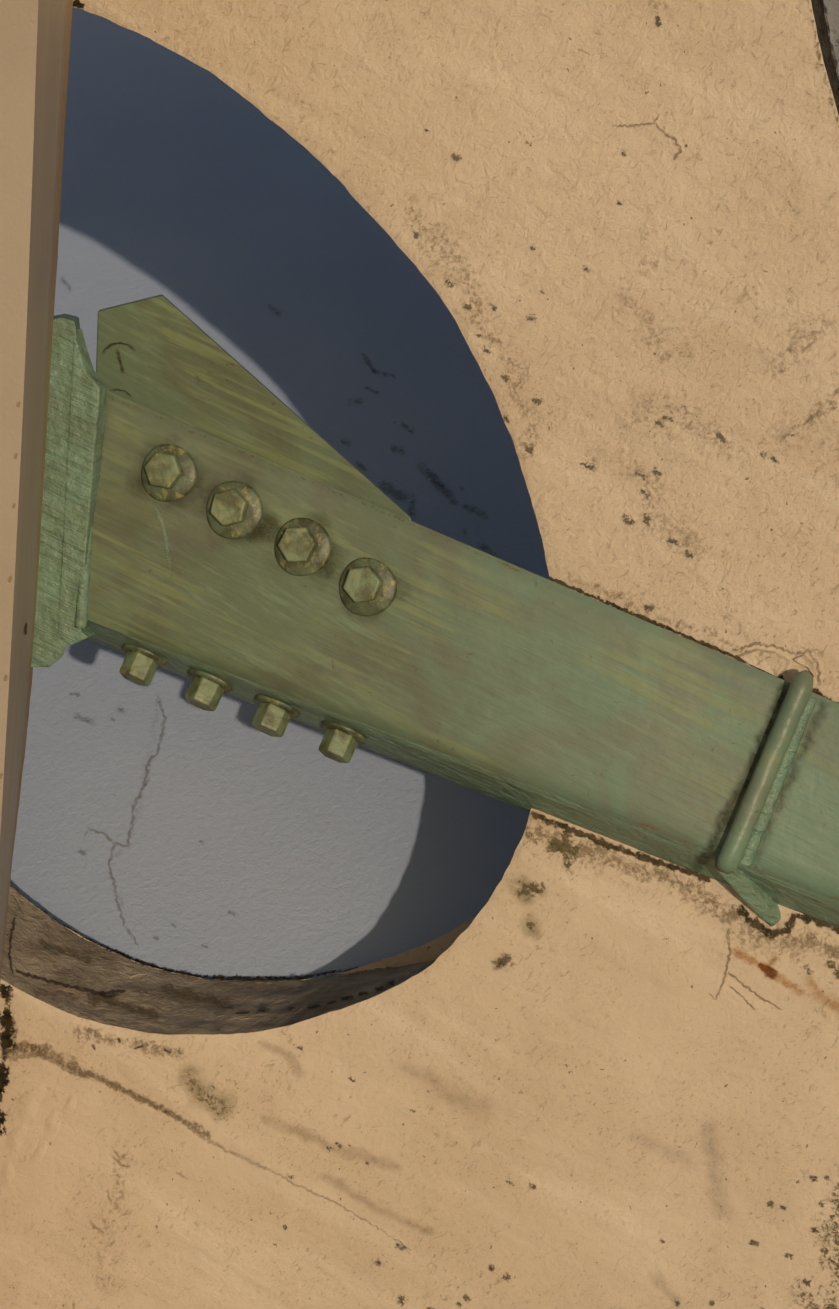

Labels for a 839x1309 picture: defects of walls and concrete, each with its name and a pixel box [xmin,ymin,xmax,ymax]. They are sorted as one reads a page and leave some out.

crack [619,116,682,159]
corrosion [736,951,788,985]
damp [0,984,40,1136]